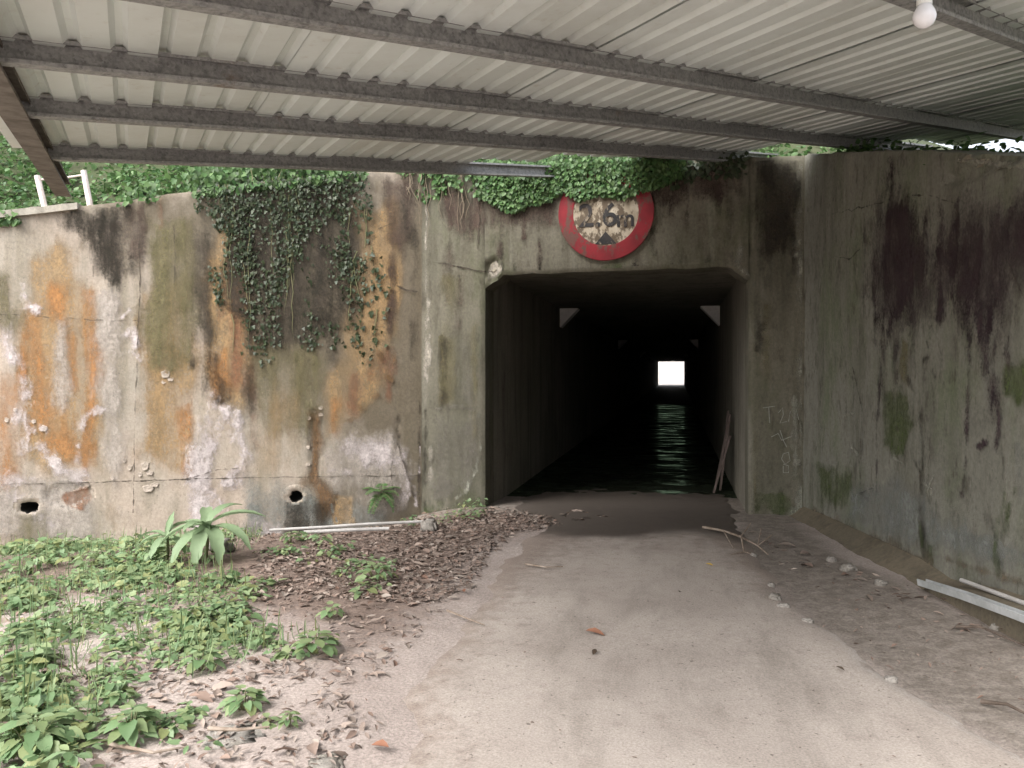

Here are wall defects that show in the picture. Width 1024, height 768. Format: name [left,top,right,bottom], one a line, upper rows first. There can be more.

water stain [4,335,18,363]
corrosion [14,243,104,471]
water stain [55,326,70,409]
water stain [65,204,168,473]
corrosion [145,226,255,472]
water stain [180,228,409,535]
corrosion [327,202,401,426]
water stain [383,181,426,247]
water stain [756,160,804,297]
water stain [872,162,1024,451]
peeling [49,481,90,510]